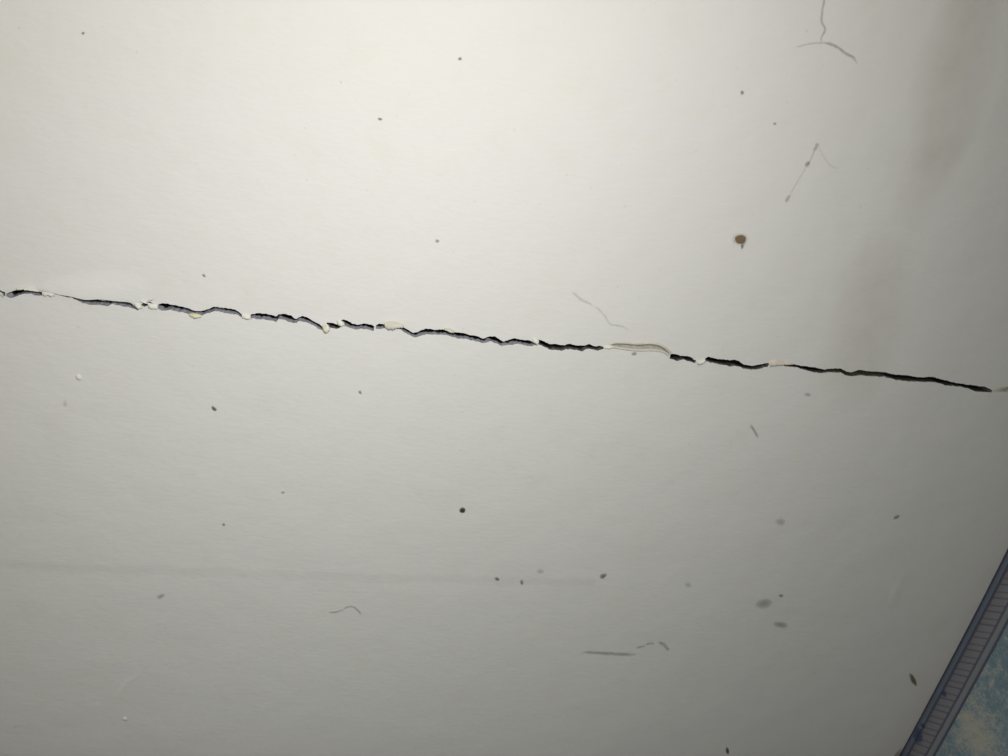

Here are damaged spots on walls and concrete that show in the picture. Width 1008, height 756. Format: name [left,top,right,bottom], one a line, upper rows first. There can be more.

crack [0,287,1007,392]